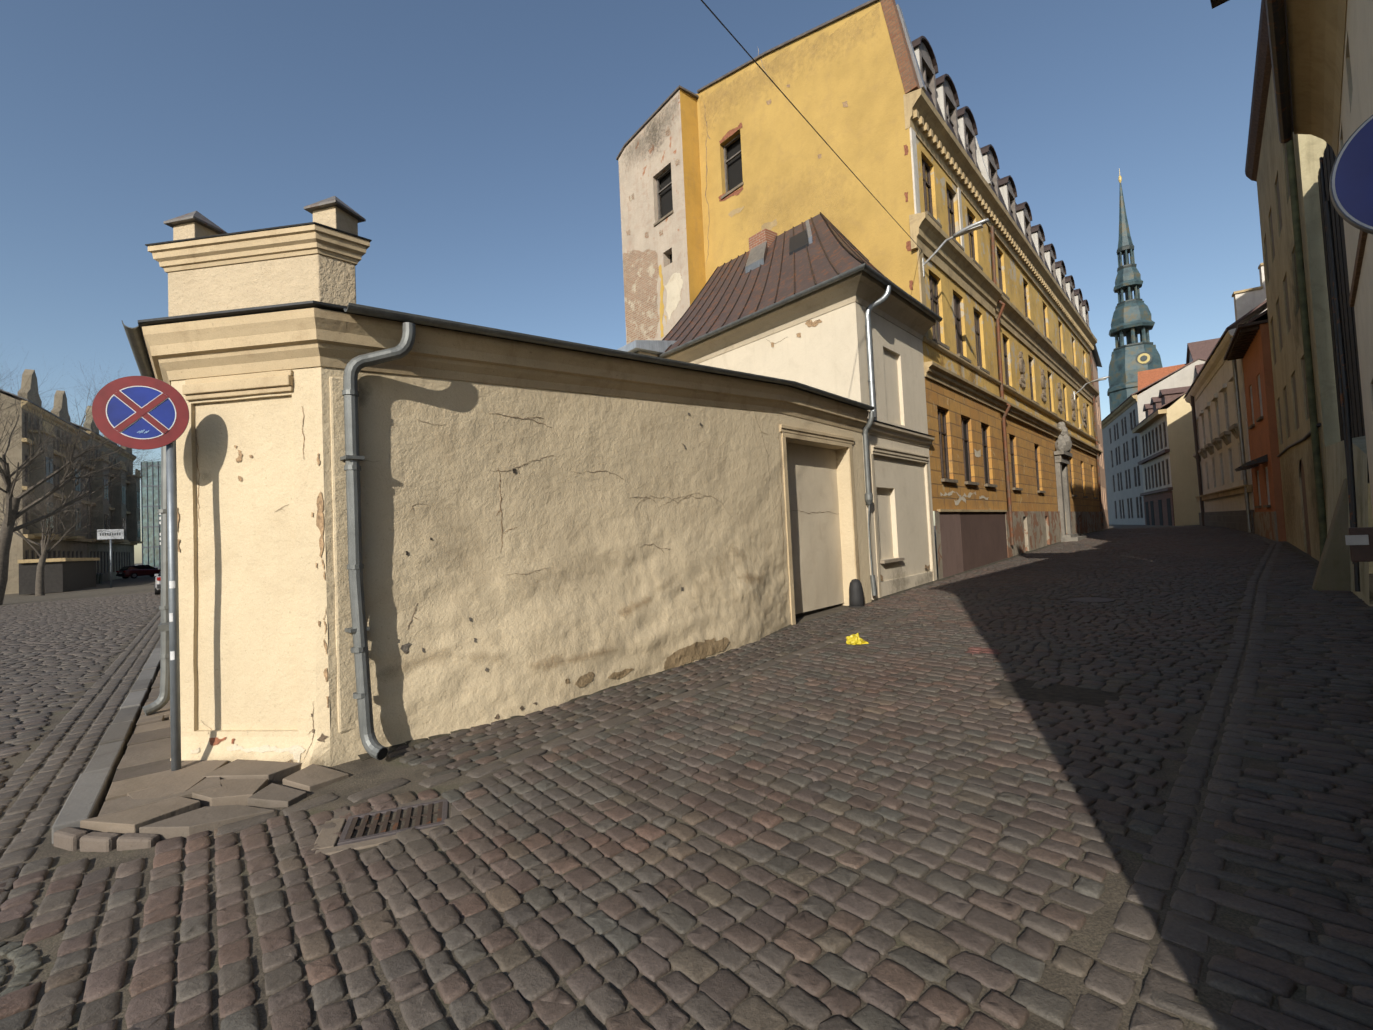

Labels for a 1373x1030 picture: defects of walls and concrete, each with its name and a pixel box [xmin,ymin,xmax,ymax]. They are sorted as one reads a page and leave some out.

peeling [623,230,683,342]
peeling [311,492,325,579]
crack [489,413,729,575]
peeling [190,609,328,763]
spalling [565,668,634,688]
spalling [664,637,730,670]